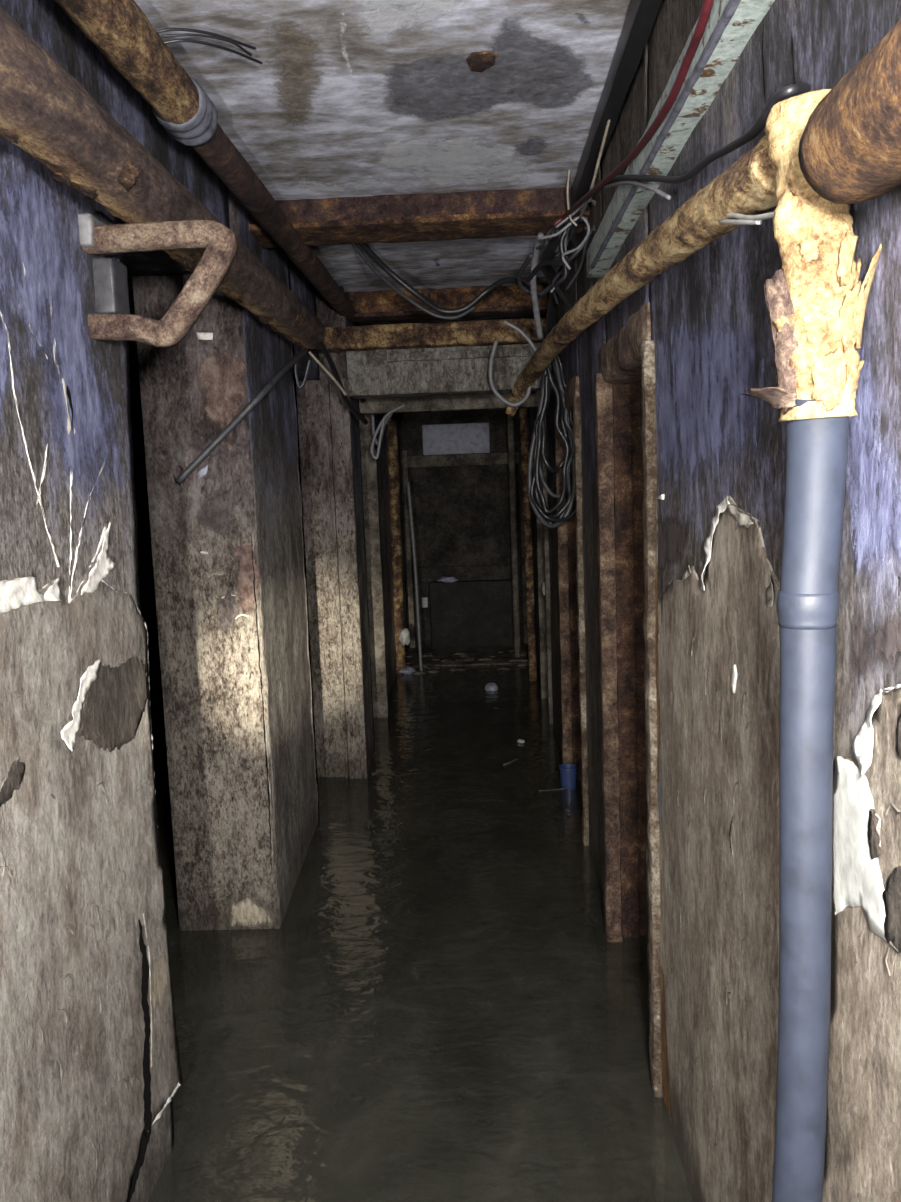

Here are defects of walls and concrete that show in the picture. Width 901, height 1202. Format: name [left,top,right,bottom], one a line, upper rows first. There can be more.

damp [386,18,591,121]
spalling [181,535,235,640]
peeling [0,521,183,1202]
crack [128,913,180,1202]
peeling [645,495,780,1202]
peeling [822,684,901,1202]